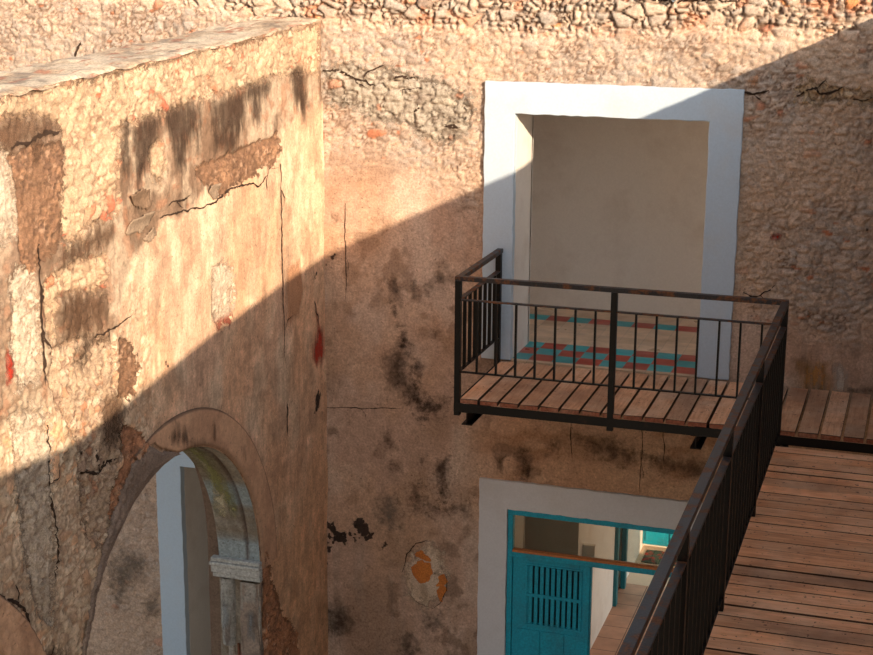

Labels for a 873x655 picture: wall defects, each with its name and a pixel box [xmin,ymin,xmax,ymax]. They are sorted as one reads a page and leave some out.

crack [639,0,761,8]
leakage [122,104,200,191]
leakage [213,82,269,150]
leakage [291,67,305,115]
crack [322,65,421,112]
crack [745,90,769,100]
crack [797,80,872,102]
crack [160,163,292,362]
crack [37,244,52,386]
leakage [64,296,105,364]
flaking render [0,22,478,655]
leakage [389,326,441,411]